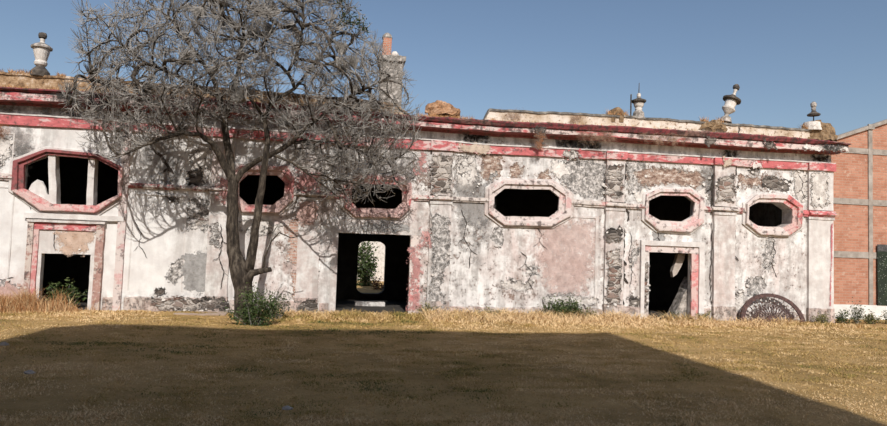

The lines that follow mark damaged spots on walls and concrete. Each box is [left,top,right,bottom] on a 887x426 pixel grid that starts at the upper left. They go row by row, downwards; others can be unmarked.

spalling [413,142,832,209]
peeling [53,230,96,257]
spalling [145,143,230,311]
peeling [500,219,651,313]